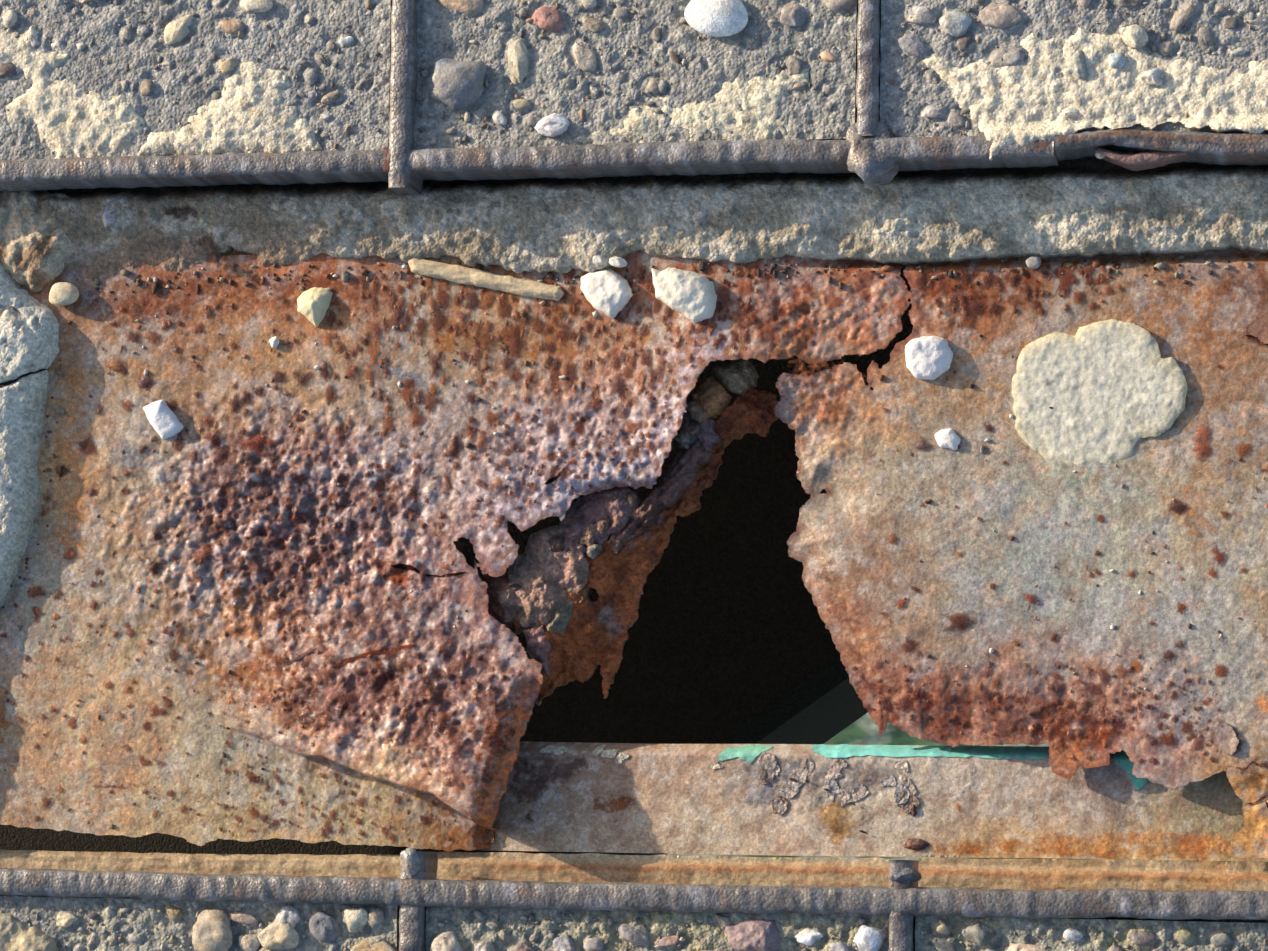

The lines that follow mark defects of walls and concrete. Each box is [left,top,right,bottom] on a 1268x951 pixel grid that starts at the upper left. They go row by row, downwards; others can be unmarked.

rust [916,260,1122,328]
rust [1224,272,1268,346]
crack [0,369,49,387]
rust [1192,425,1210,459]
rust [1168,486,1206,537]
rust [0,264,810,844]
rust [1209,546,1225,578]
rust [945,613,975,631]
rust [1024,585,1039,620]
rust [845,638,1242,765]
crack [1228,761,1268,808]
rust [903,831,1231,859]